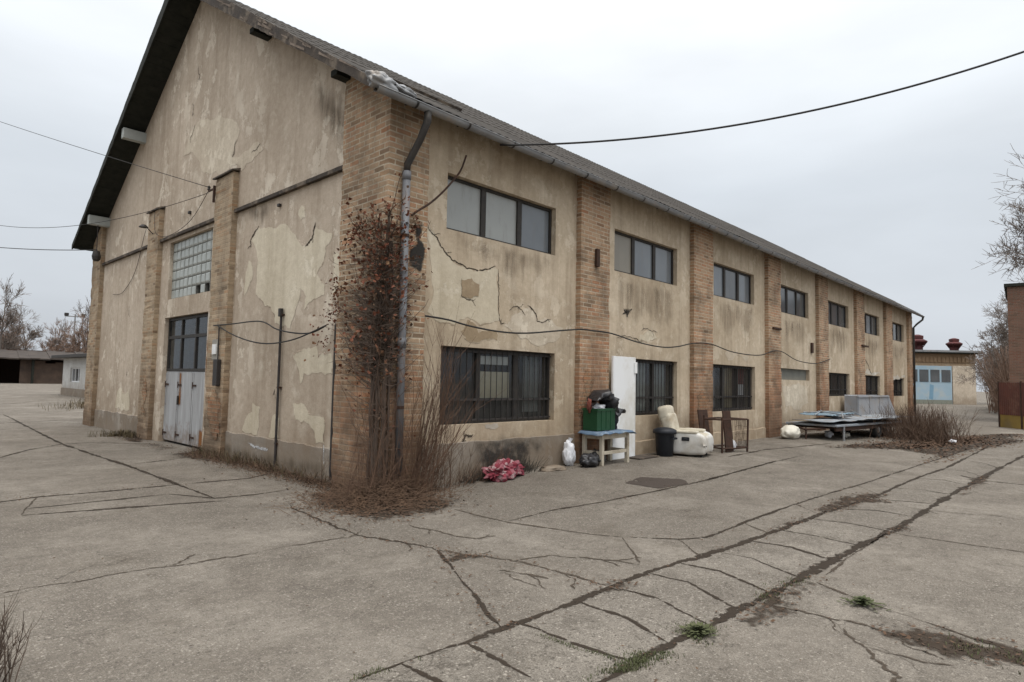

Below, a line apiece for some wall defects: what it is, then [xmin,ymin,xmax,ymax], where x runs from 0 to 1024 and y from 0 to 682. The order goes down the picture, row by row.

peeling [244,224,340,328]
crack [427,224,551,324]
peeling [427,225,563,346]
peeling [292,346,333,383]
peeling [293,403,326,444]
crack [0,414,1024,682]